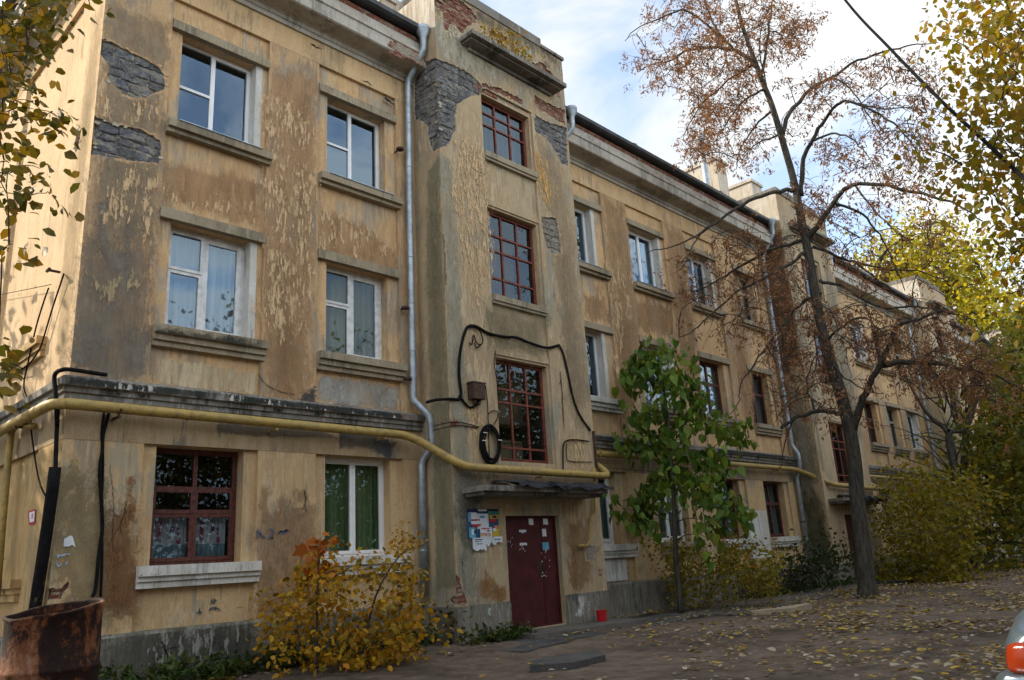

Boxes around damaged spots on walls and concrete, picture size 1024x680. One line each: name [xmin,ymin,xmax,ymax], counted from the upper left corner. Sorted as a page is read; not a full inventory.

flaking render [434,0,507,46]
flaking render [73,38,387,345]
flaking render [412,59,568,314]
damp [50,461,257,680]